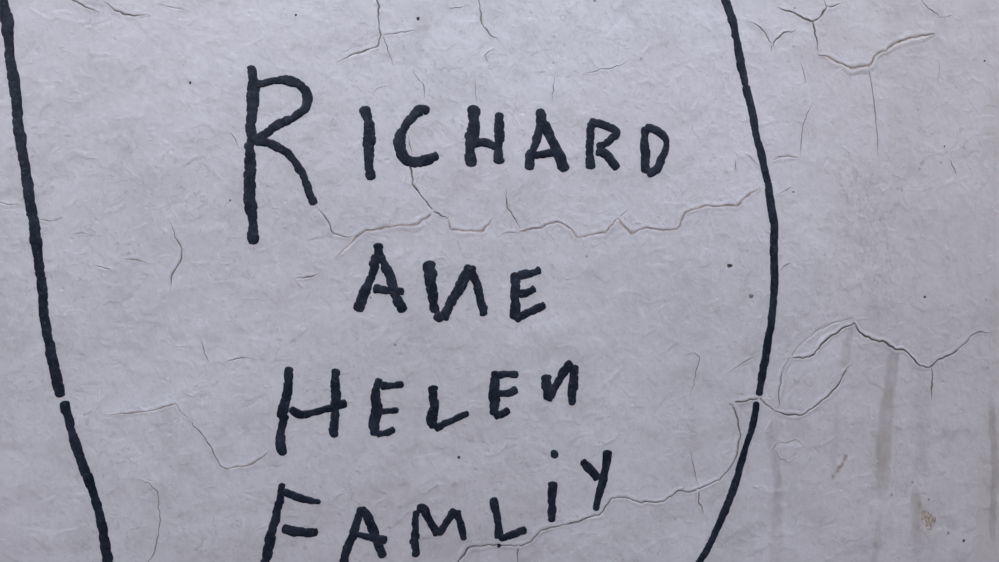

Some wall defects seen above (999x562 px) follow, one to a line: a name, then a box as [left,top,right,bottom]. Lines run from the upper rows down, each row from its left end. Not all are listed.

crack [0,200,95,237]
crack [93,218,186,291]
crack [294,0,952,282]
crack [455,315,991,562]